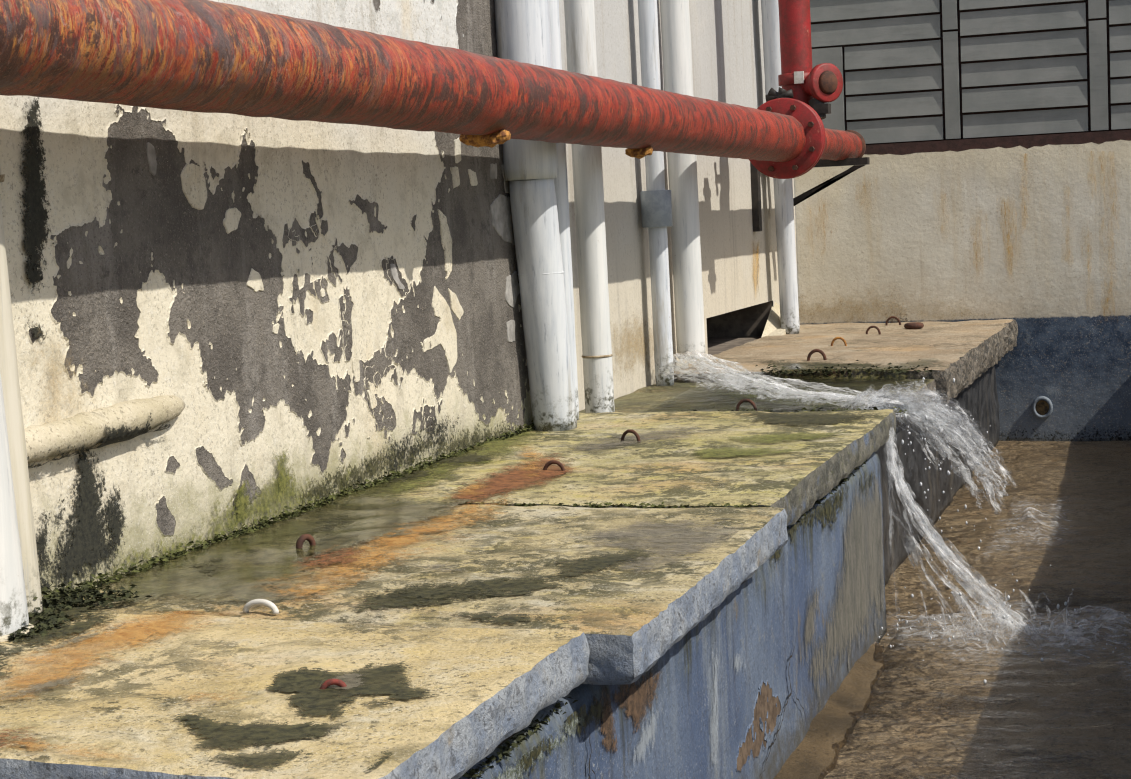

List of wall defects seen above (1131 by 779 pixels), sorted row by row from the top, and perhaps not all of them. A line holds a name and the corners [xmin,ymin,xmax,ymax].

peeling [423,0,498,58]
leakage [18,97,51,294]
peeling [27,326,45,345]
leakage [27,321,48,341]
peeling [49,104,530,475]
peeling [194,445,262,518]
leakage [27,413,487,611]
corrosion [274,449,572,600]
corrosion [0,611,205,700]
leakage [329,673,365,689]
spalling [735,680,782,773]